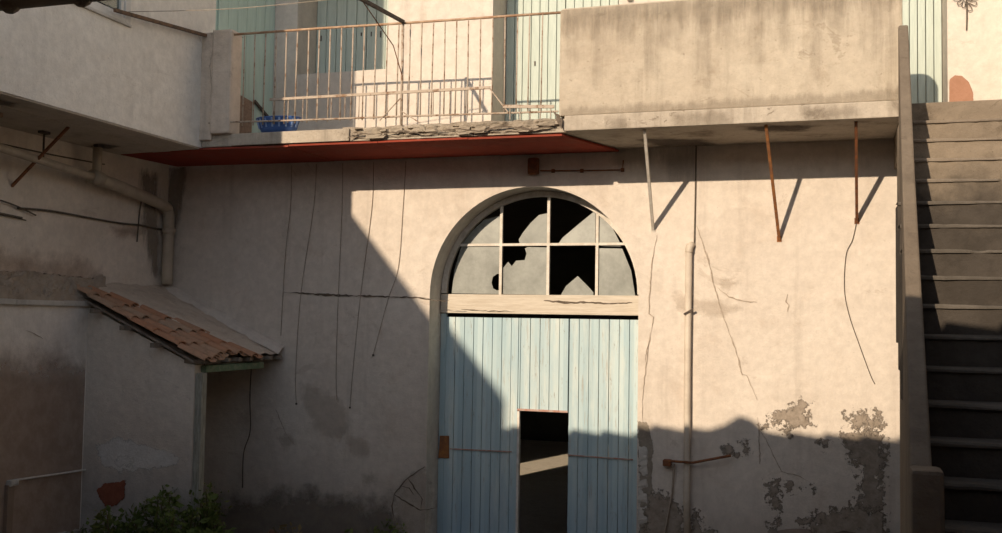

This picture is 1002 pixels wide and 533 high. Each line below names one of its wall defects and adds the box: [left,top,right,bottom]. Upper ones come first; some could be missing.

peeling [949,75,973,102]
crack [642,238,657,421]
crack [697,227,811,483]
peeling [757,396,817,439]
peeling [96,480,126,506]
crack [391,467,434,517]
spalling [637,422,718,533]
rust [663,454,731,533]
peeling [720,438,750,458]
peeling [762,477,816,533]
peeling [795,407,891,533]